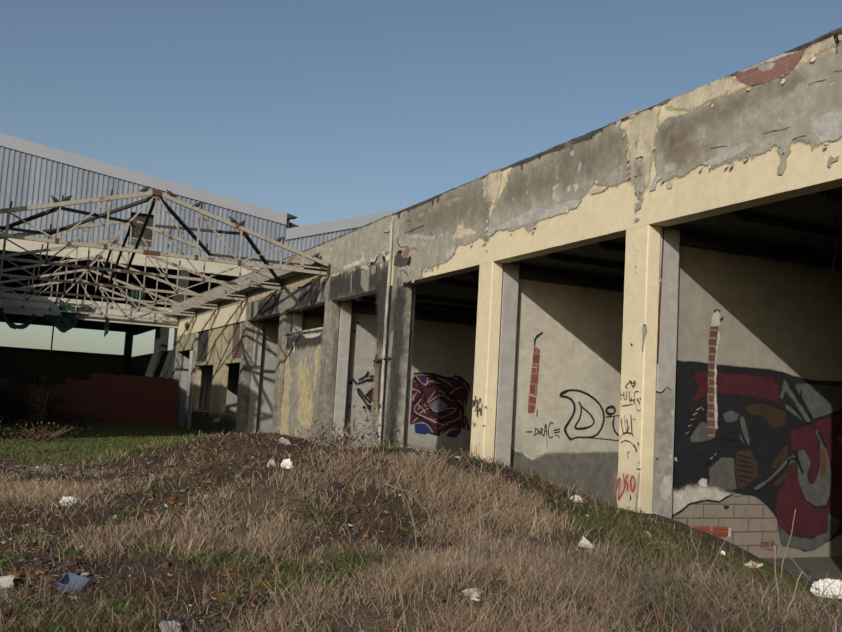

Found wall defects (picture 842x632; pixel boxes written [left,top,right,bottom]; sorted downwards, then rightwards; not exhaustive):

peeling [330,29,842,284]
flaking render [652,387,780,558]